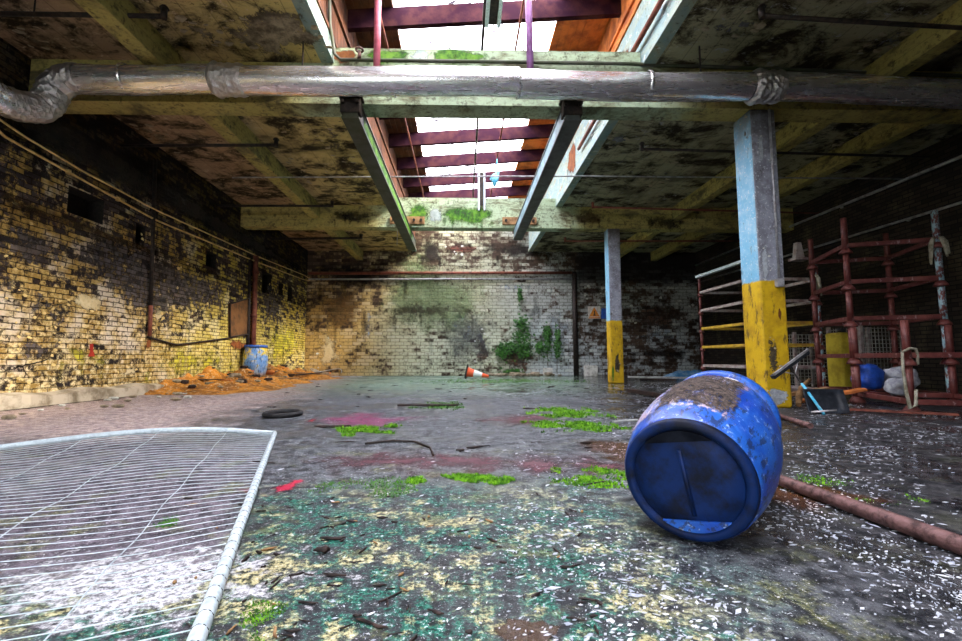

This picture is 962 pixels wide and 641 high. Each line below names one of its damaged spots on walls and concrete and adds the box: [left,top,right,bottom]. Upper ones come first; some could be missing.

leakage [335,198,368,222]
leakage [647,217,684,229]
leakage [328,293,357,326]
leakage [368,305,487,357]
leakage [316,336,341,368]
leakage [633,349,685,359]
peeling [767,388,789,405]